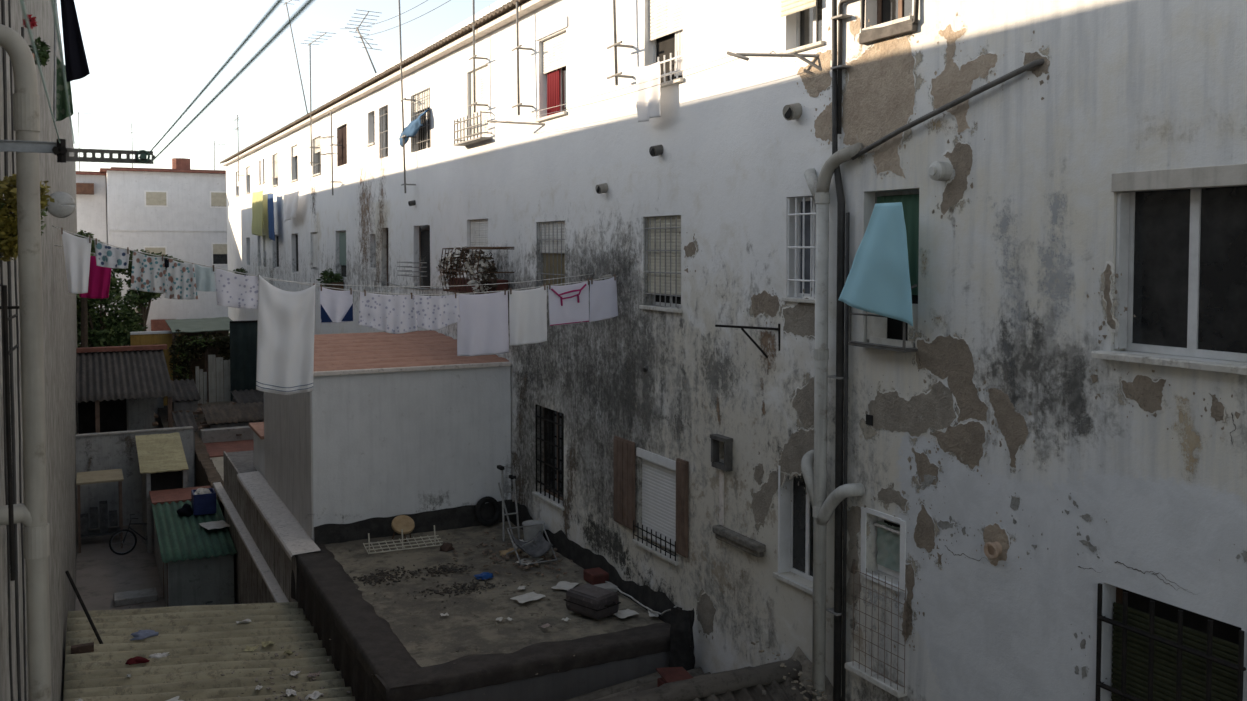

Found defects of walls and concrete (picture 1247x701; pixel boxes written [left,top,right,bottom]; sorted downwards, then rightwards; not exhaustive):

flaking render [795,13,1004,227]
water stain [504,359,552,510]
water stain [562,438,674,604]
water stain [563,313,746,439]
flaking render [745,373,814,535]
flaking render [842,319,1049,651]
water stain [1000,303,1043,405]
water stain [1043,356,1093,436]
flaking render [1057,492,1107,561]
flaking render [1090,368,1170,418]
crack [1078,561,1192,593]
flaking render [1059,624,1090,695]